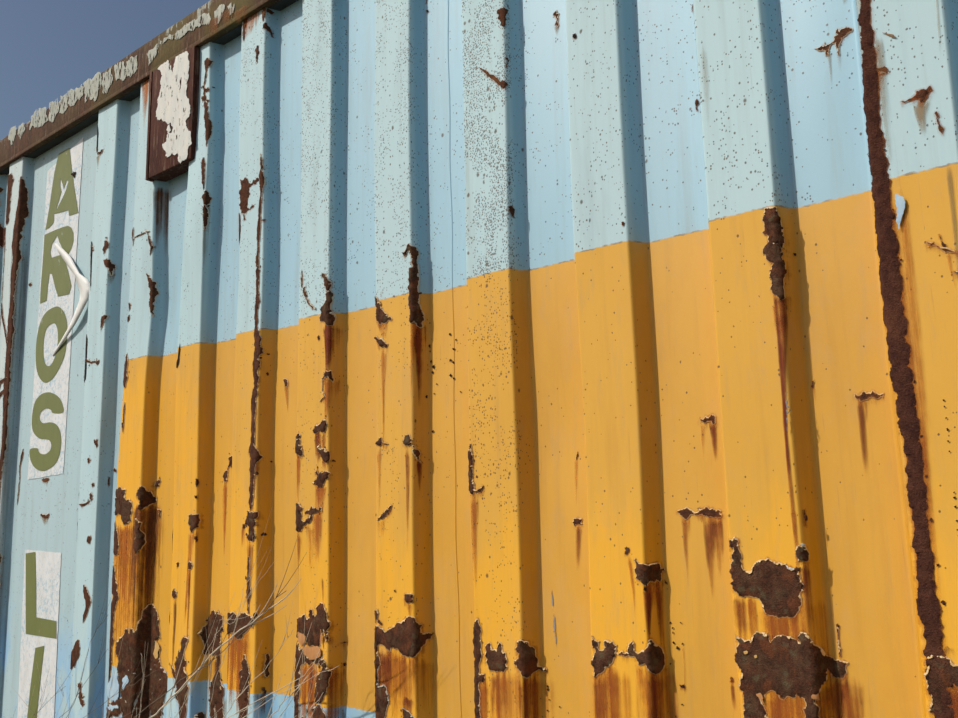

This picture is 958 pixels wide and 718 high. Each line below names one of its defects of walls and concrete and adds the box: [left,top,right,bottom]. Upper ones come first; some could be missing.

peeling [8,3,234,164]
corrosion [0,173,30,494]
corrosion [468,444,484,548]
corrosion [677,206,851,718]
corrosion [70,639,80,670]
corrosion [83,584,92,623]
corrosion [106,468,271,718]
corrosion [294,602,346,718]
corrosion [374,590,434,718]
corrosion [472,619,548,718]
corrosion [591,547,685,718]
corrosion [923,647,958,718]